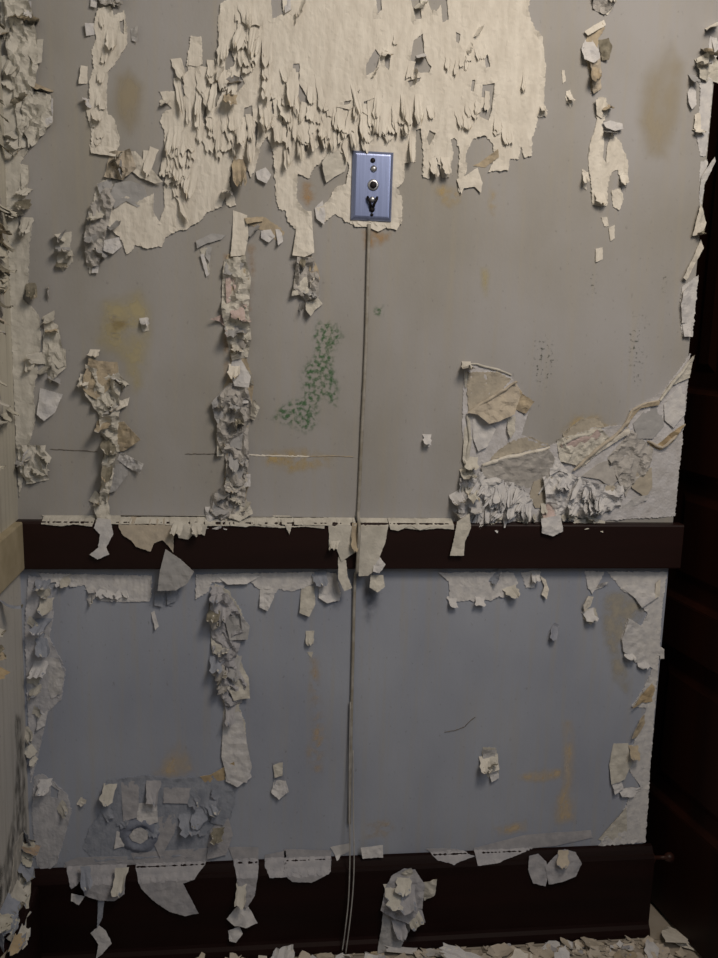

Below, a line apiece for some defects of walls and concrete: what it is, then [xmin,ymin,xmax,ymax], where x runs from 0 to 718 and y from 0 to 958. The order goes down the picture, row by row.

peeling [0,0,66,496]
water stain [280,324,338,427]
peeling [79,0,548,316]
peeling [561,70,575,107]
peeling [581,0,629,262]
peeling [679,22,718,337]
peeling [41,210,696,958]
peeling [0,572,152,958]